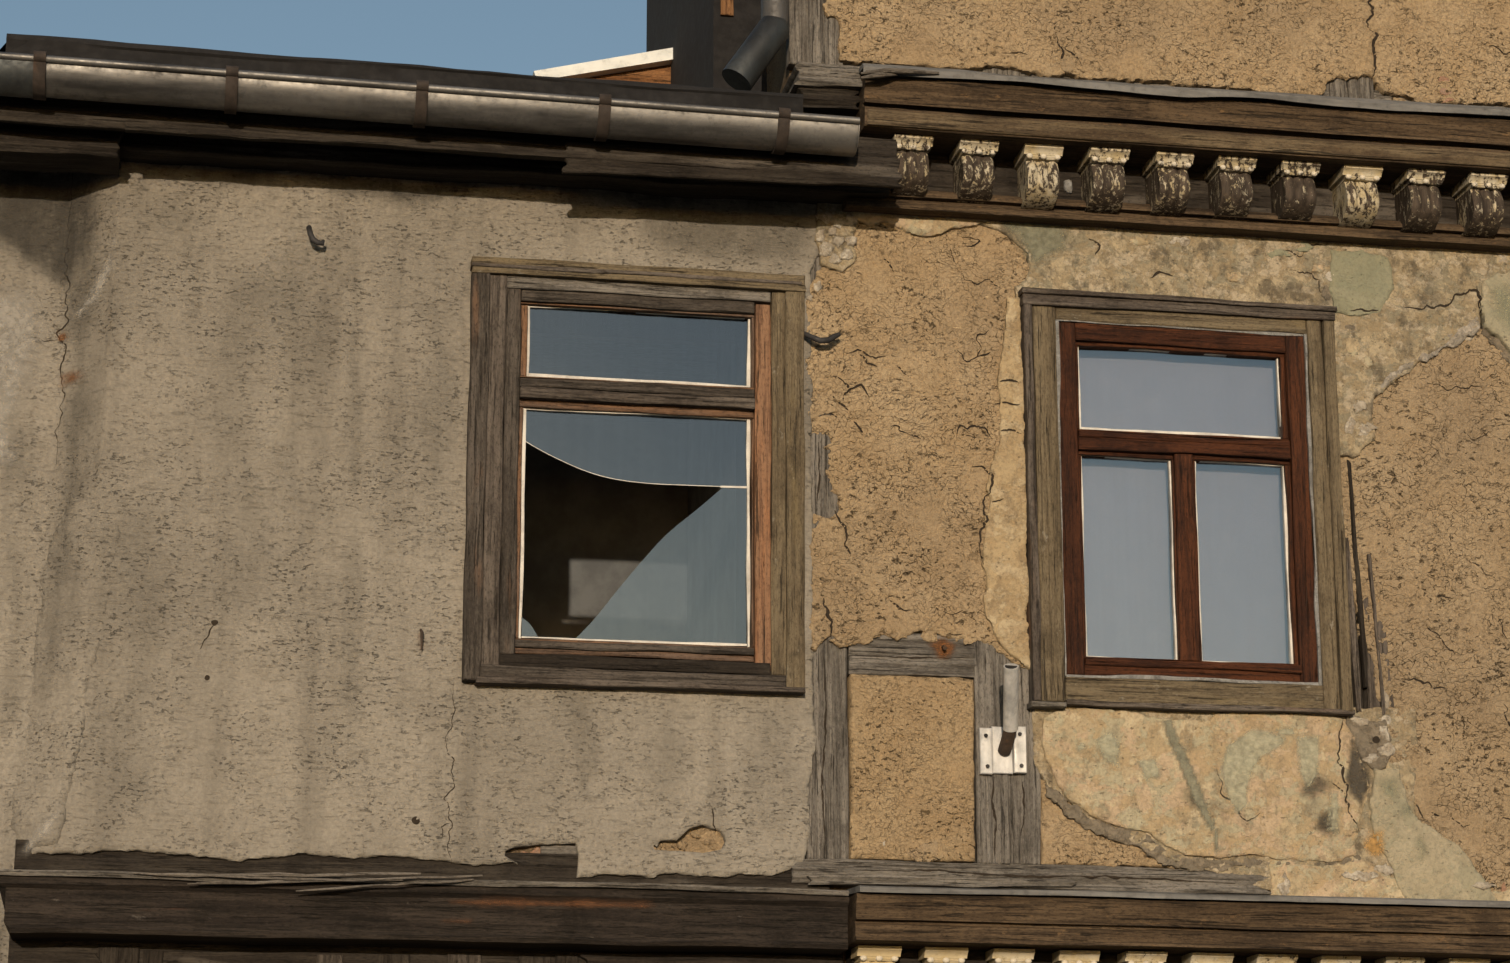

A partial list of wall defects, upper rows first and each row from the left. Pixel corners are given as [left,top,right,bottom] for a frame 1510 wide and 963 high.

flaking render [822,0,1510,108]
crack [1366,0,1379,81]
water stain [0,172,92,277]
crack [884,237,1002,289]
crack [1285,244,1327,293]
crack [1352,289,1482,319]
crack [816,349,921,556]
crack [957,330,1021,564]
flaking render [805,203,1510,901]
crack [441,695,455,862]
flaking render [505,844,577,854]
flaking render [654,826,724,853]